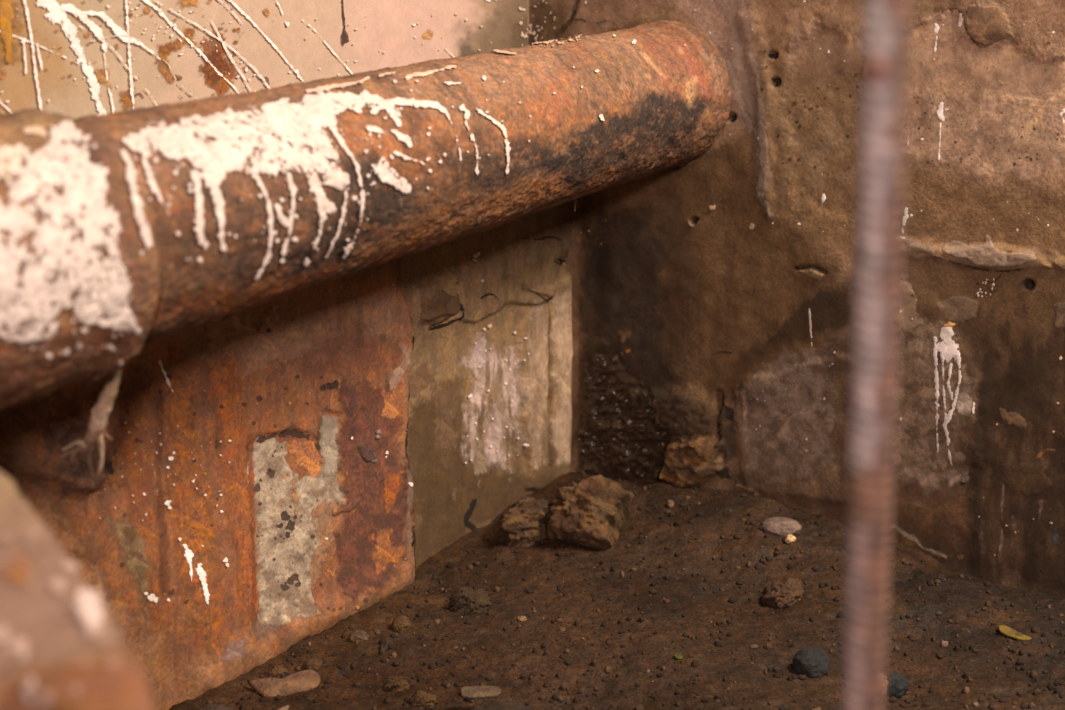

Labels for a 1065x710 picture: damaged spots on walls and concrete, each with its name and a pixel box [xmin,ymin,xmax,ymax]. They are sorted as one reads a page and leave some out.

rust [0,0,27,79]
rust [95,62,139,110]
rust [156,22,245,95]
crack [558,0,617,33]
spalling [320,380,339,390]
water stain [890,275,1065,598]
rust [21,302,415,667]
spalling [246,415,346,626]